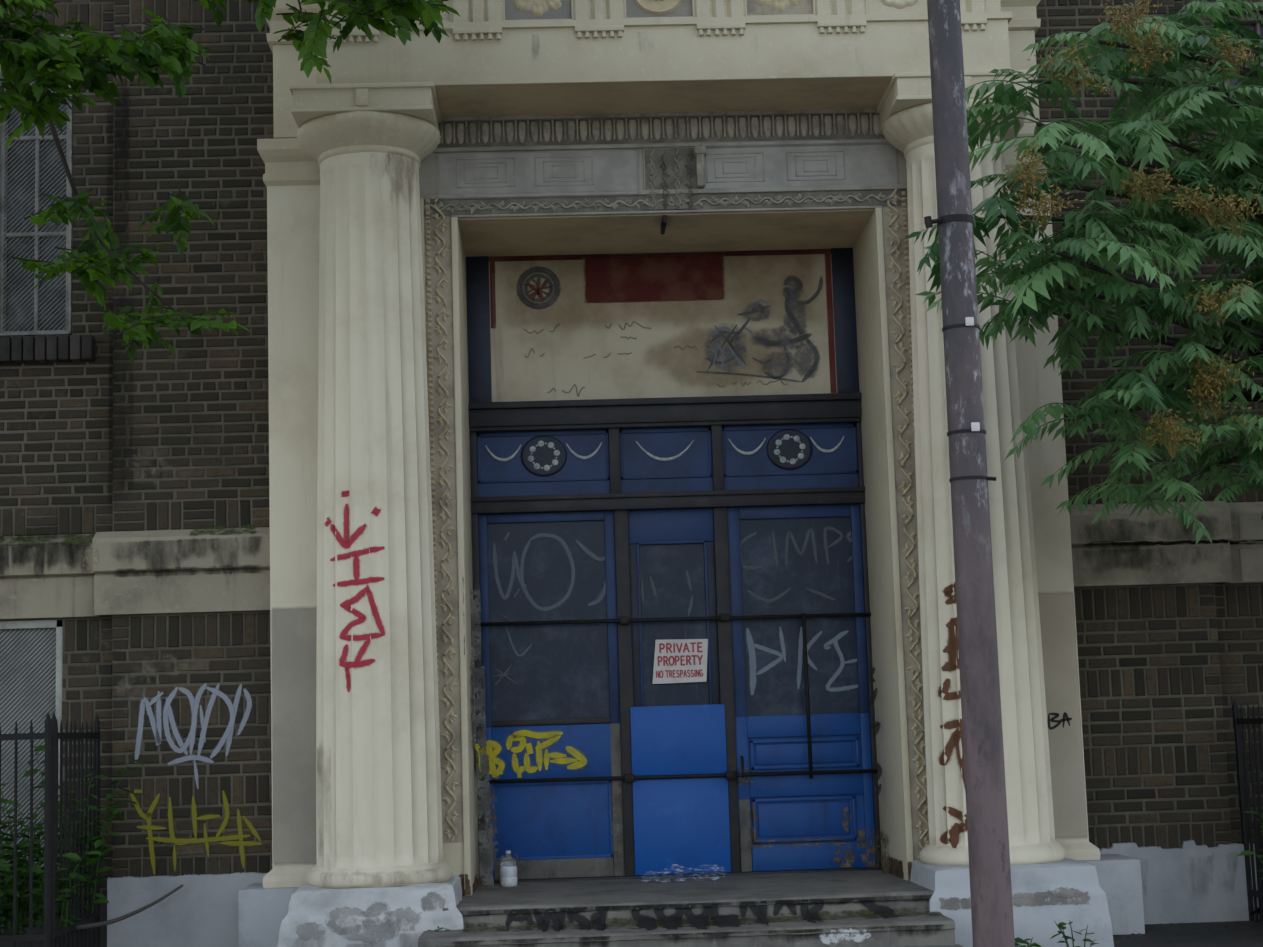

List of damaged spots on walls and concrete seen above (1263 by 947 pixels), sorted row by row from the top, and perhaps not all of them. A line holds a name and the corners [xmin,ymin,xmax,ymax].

water stain [0,541,88,574]
water stain [118,537,260,577]
spalling [459,579,523,896]
peeling [296,892,445,944]